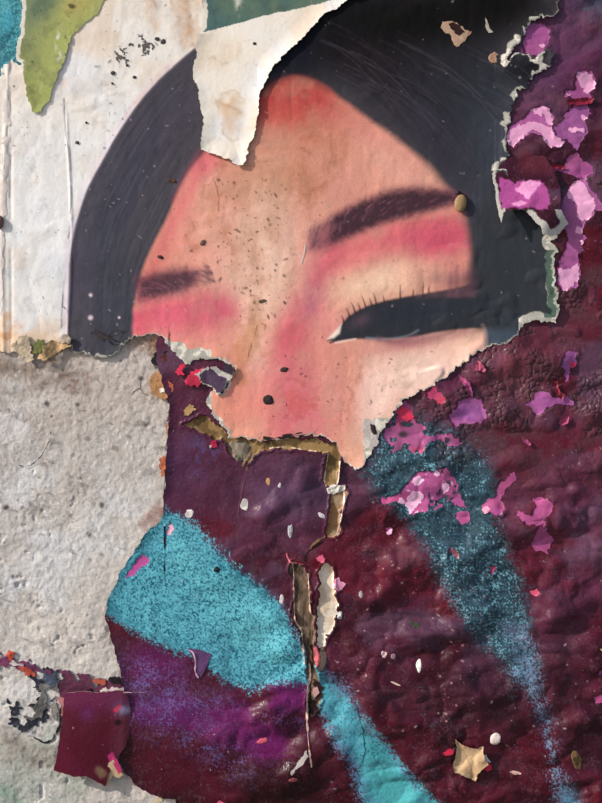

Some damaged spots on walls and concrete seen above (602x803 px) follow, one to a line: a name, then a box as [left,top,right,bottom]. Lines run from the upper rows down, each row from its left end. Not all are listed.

peeling [523,23,550,56]
peeling [175,363,234,396]
peeling [0,334,176,803]
peeling [316,555,346,648]